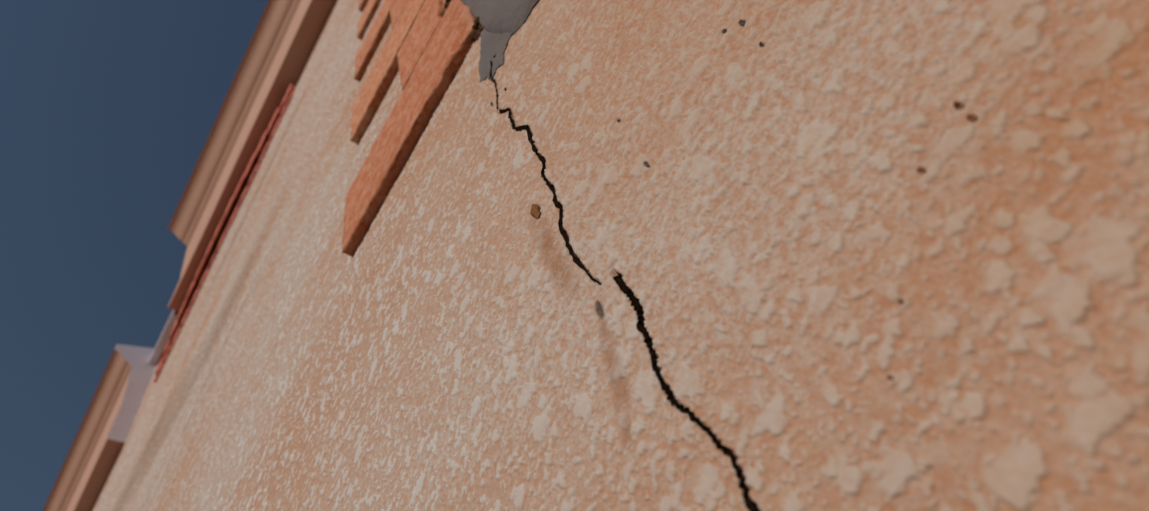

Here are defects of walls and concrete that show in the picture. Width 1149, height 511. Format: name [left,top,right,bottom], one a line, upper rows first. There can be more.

crack [489,61,759,511]